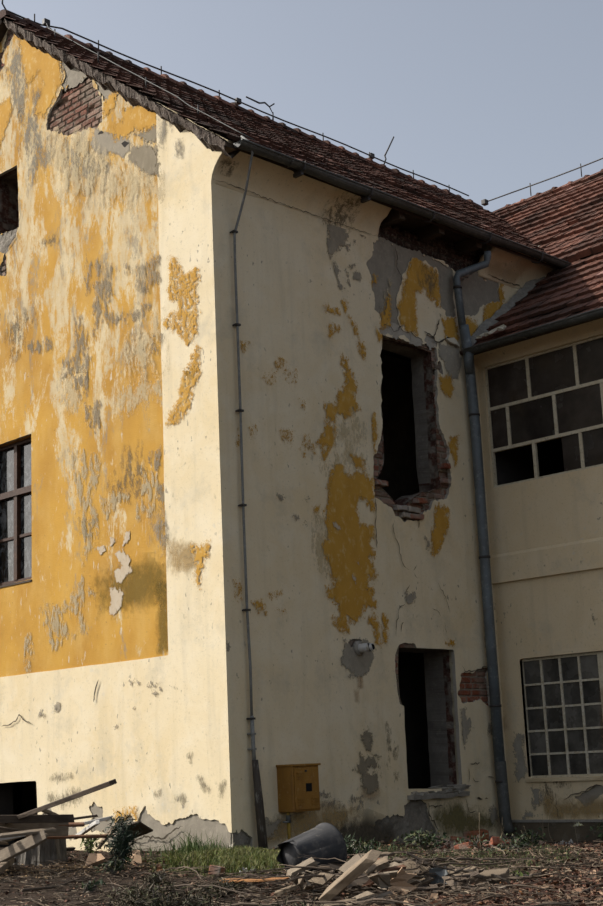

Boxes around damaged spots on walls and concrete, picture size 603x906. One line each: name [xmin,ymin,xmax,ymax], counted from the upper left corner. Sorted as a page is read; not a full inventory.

flaking render [0,31,160,177]
spalling [0,229,17,276]
peeling [62,255,202,434]
spalling [323,224,506,398]
peeling [71,448,165,615]
peeling [280,351,389,678]
peeling [424,503,450,557]
peeling [42,575,94,652]
flaking render [457,668,488,749]
spalling [319,725,381,811]
spalling [90,802,251,851]